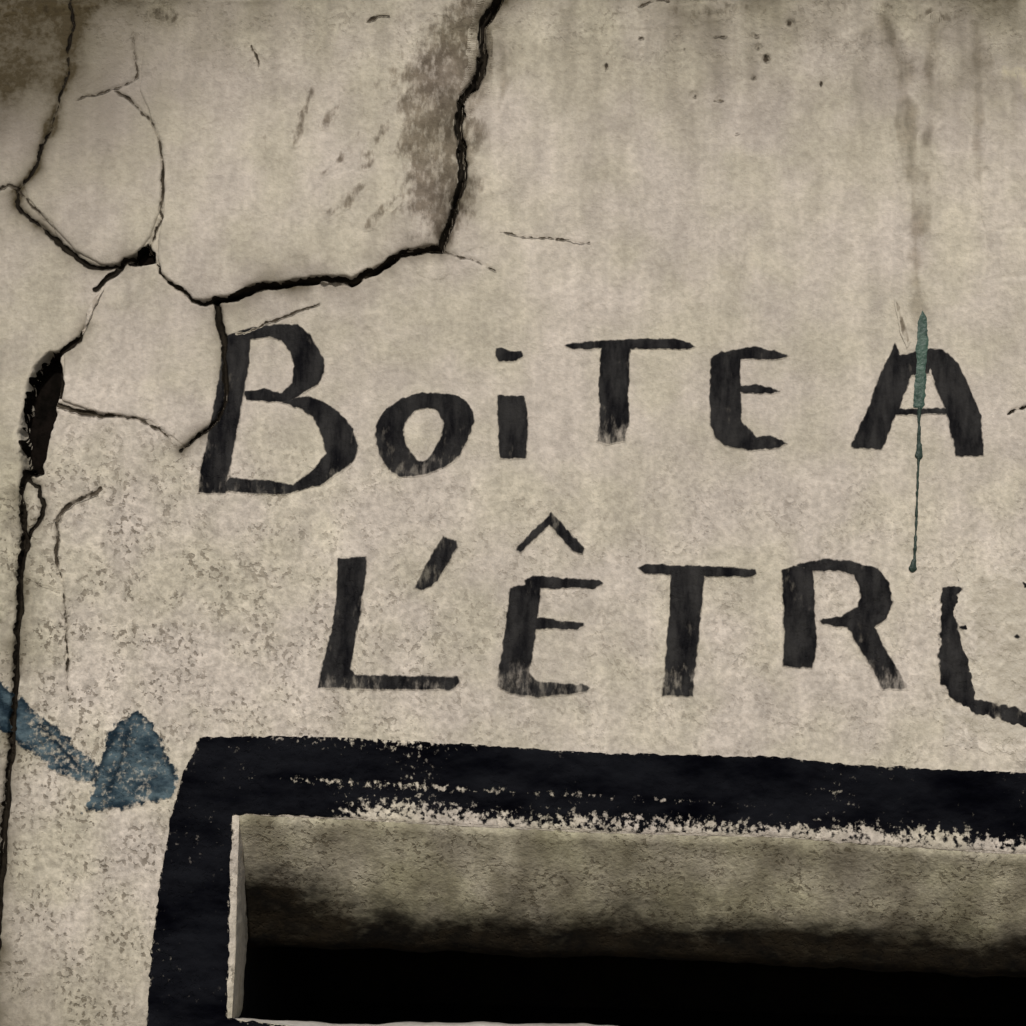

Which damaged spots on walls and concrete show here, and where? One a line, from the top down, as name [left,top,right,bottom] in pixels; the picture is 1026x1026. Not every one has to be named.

crack [0,0,504,452]
water stain [290,0,533,281]
crack [500,231,590,244]
crack [0,469,102,949]